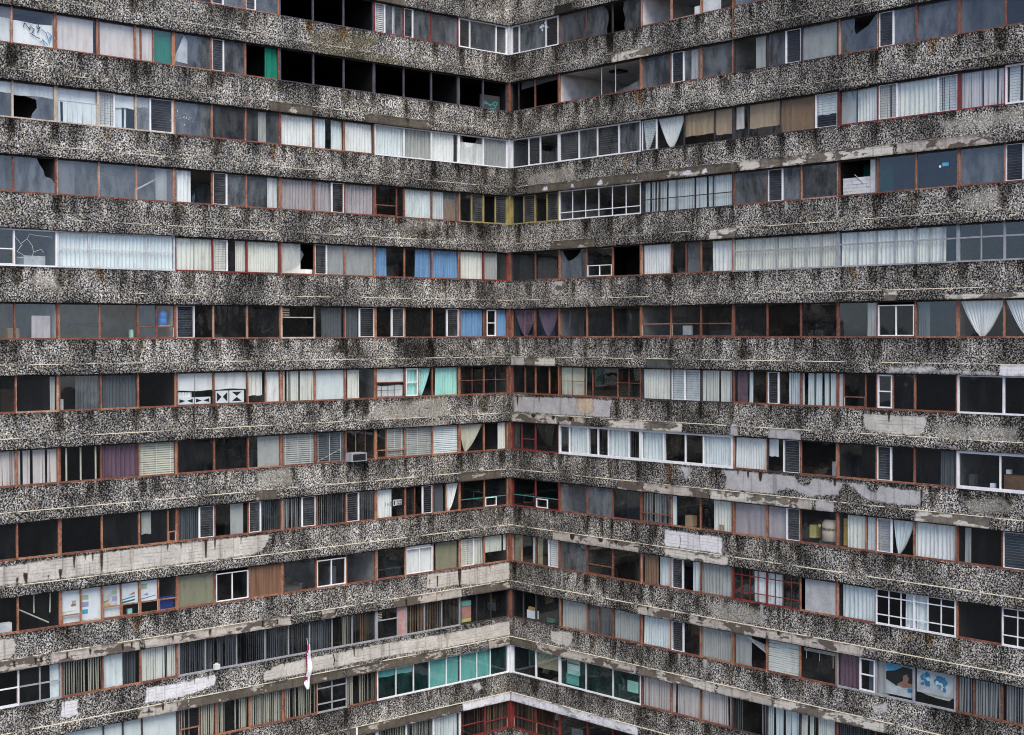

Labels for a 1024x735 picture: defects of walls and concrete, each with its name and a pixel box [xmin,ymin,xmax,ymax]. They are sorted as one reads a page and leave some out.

spalling [859,410,930,436]
spalling [0,534,270,586]
spalling [662,529,730,567]
spalling [426,562,510,591]
spalling [144,674,216,704]